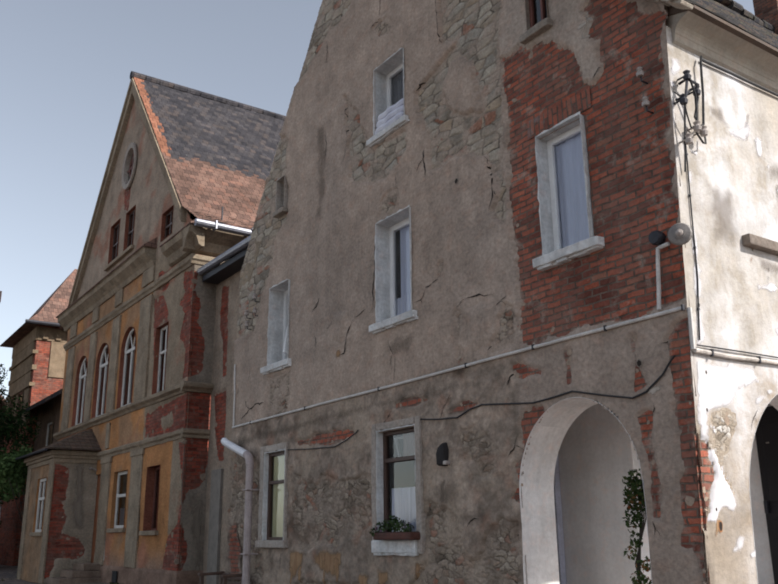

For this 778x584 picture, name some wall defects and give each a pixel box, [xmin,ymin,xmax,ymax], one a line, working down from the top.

spalling [346,97,407,184]
spalling [180,270,205,379]
crack [314,240,378,355]
spalling [491,0,762,584]
spalling [44,464,85,579]
spalling [145,391,264,584]
spalling [460,424,502,478]